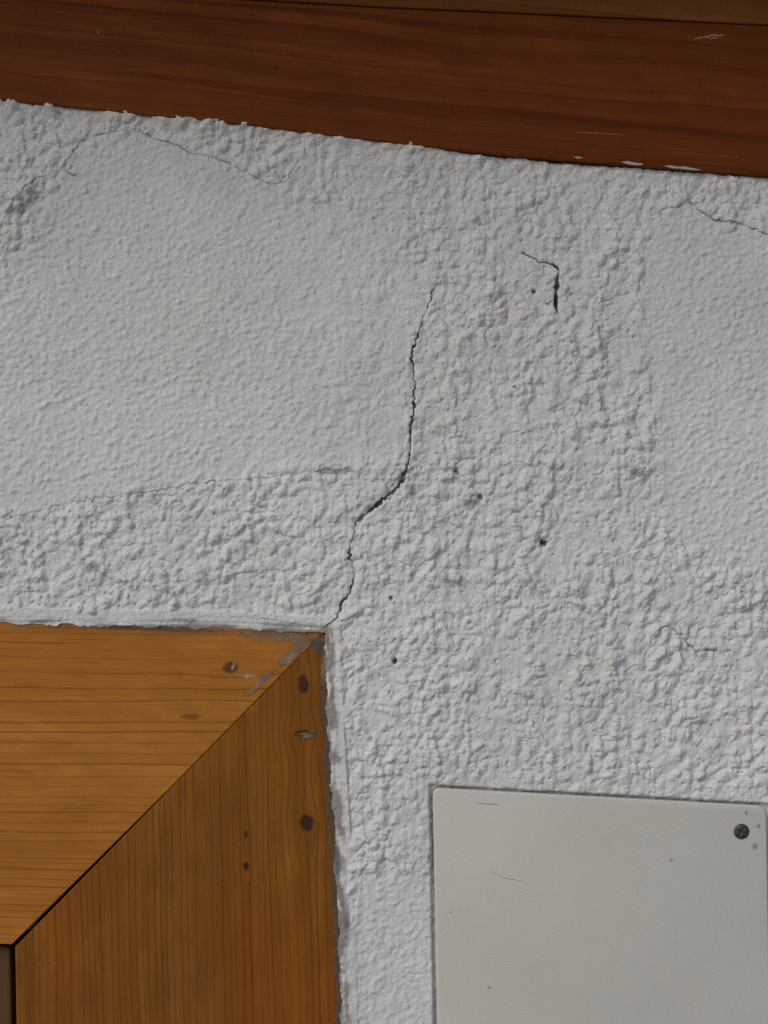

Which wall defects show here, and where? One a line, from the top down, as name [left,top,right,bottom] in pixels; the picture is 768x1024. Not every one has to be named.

crack [520,252,560,313]
crack [325,284,438,627]